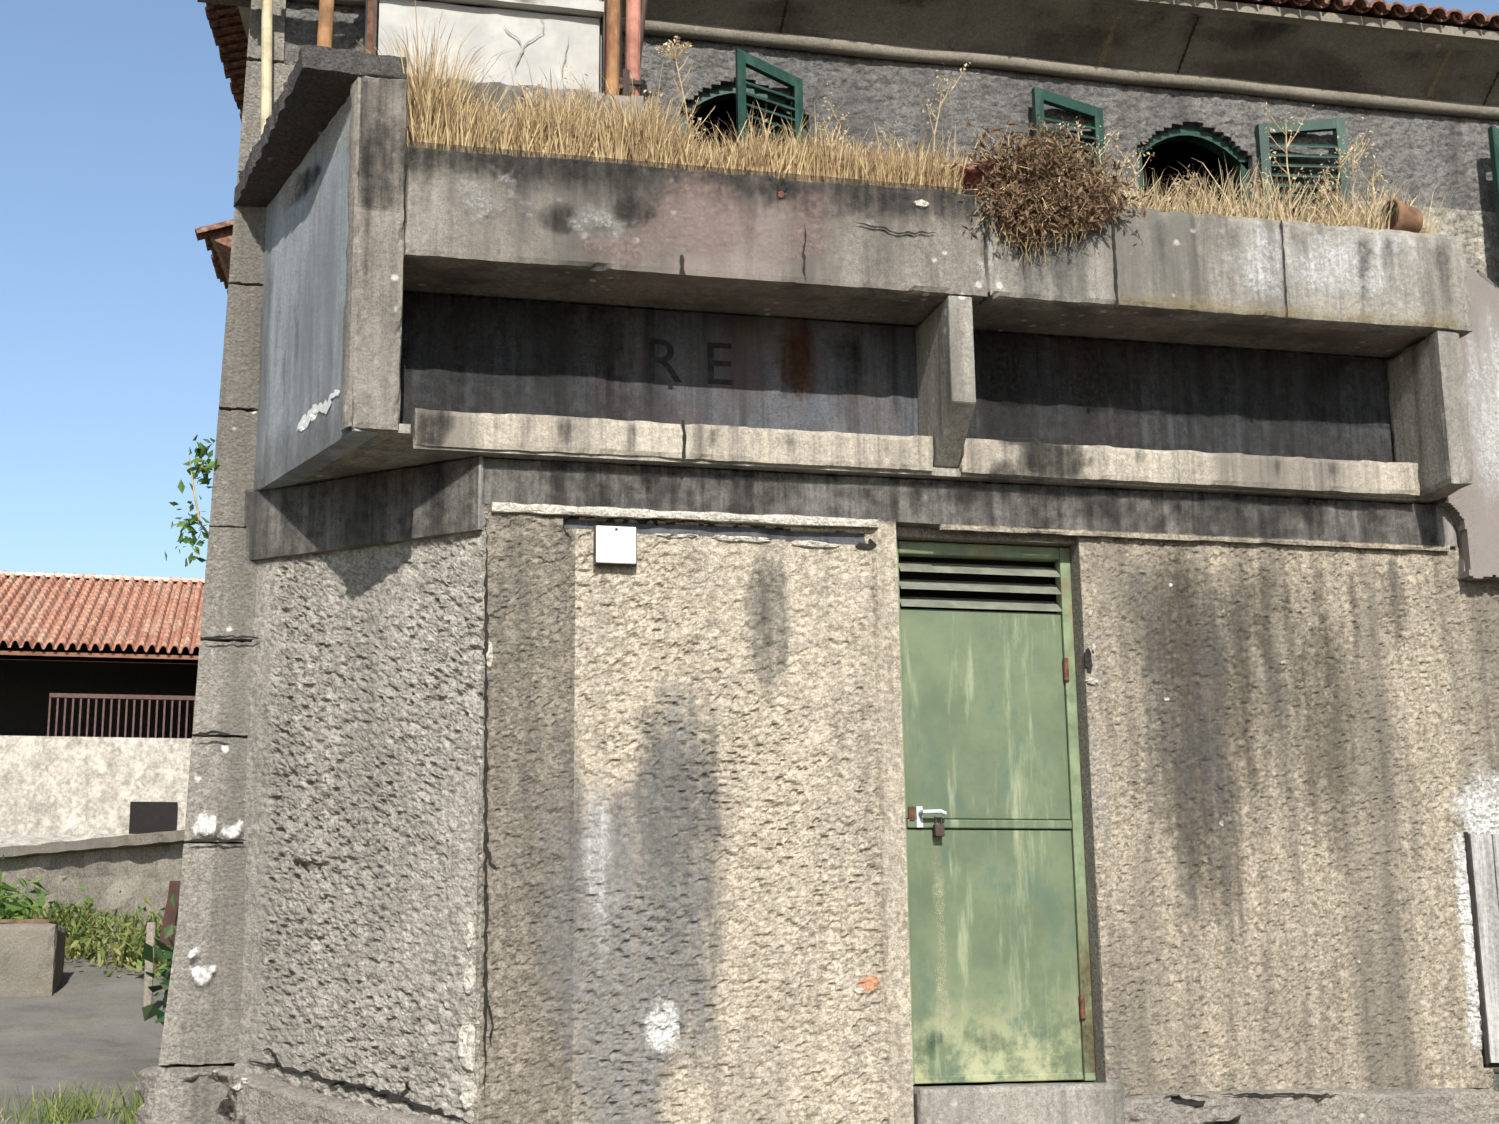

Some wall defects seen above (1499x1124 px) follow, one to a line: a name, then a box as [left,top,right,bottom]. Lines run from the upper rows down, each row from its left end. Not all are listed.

crack [800,224,808,281]
crack [856,222,936,235]
peeling [296,389,340,432]
leakage [1148,556,1265,891]
leakage [545,698,719,1124]
spalling [184,1070,249,1124]